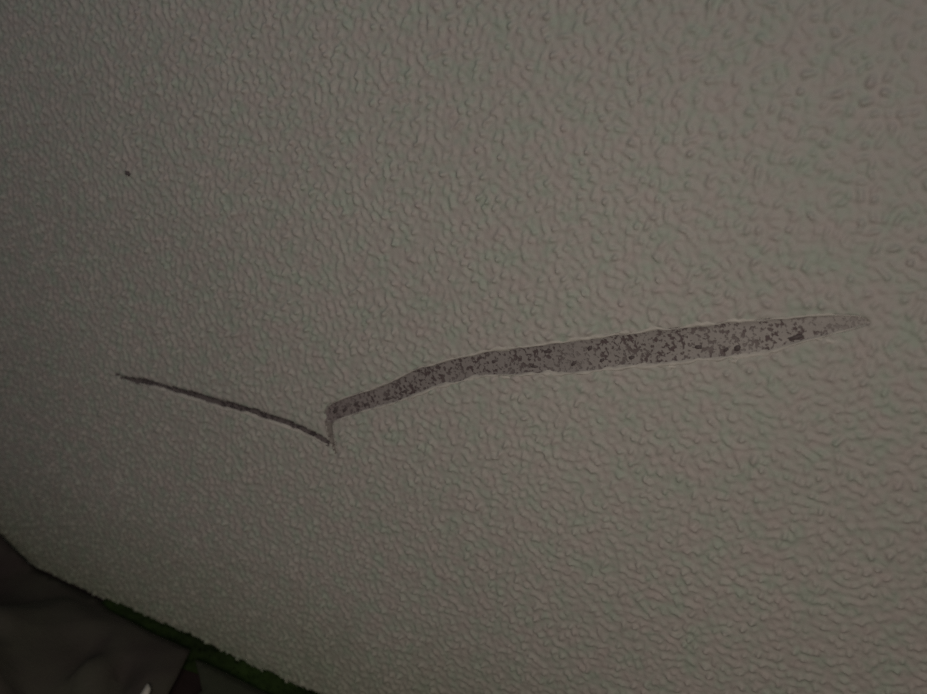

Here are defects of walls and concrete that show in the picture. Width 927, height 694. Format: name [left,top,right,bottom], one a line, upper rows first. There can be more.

crack [115,373,338,454]